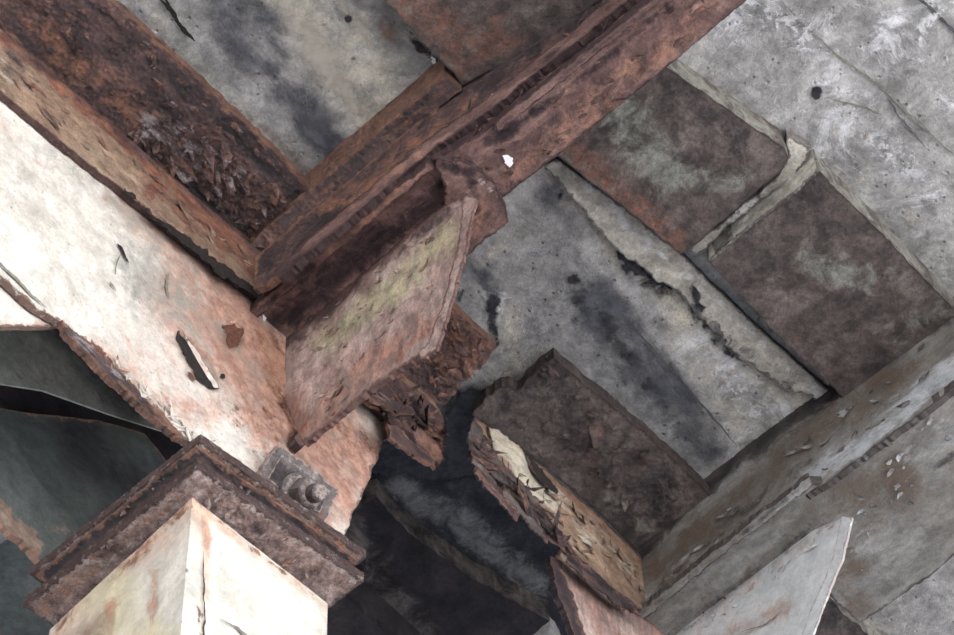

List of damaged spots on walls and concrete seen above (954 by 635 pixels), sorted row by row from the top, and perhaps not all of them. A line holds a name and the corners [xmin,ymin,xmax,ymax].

leakage [213,0,359,155]
peeling [150,208,182,232]
leakage [471,265,497,292]
rust [222,321,244,348]
leakage [570,280,721,460]
crack [203,552,247,635]